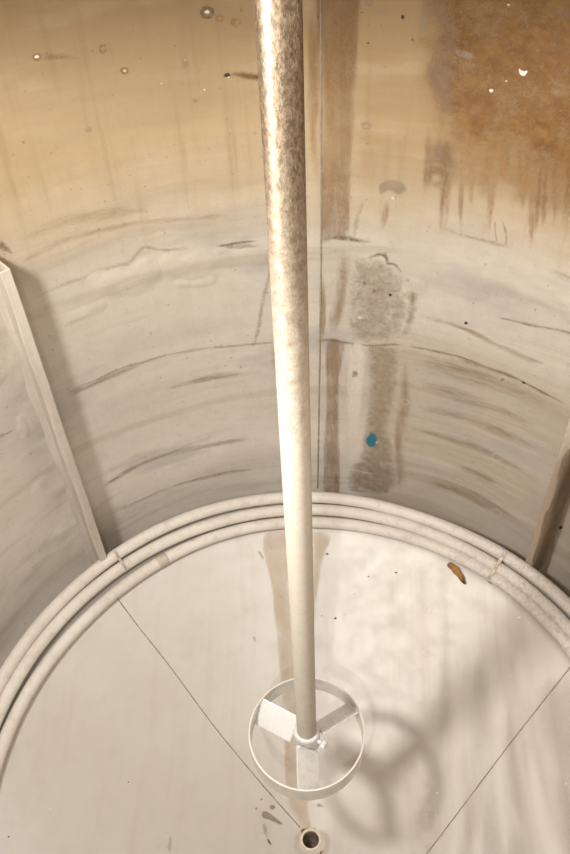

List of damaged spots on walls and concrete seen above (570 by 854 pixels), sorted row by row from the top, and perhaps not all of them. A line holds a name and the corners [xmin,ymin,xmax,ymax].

leakage [305,0,373,244]
rust [409,0,570,226]
leakage [319,252,398,493]